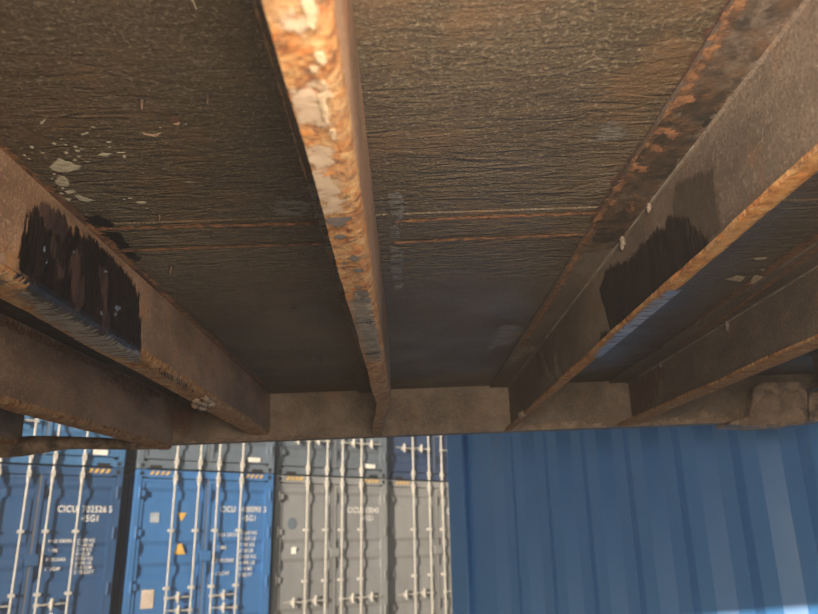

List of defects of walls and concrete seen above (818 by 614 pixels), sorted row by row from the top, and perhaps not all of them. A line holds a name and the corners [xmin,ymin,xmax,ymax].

peeling [301,0,319,30]
peeling [309,51,336,140]
peeling [23,138,95,202]